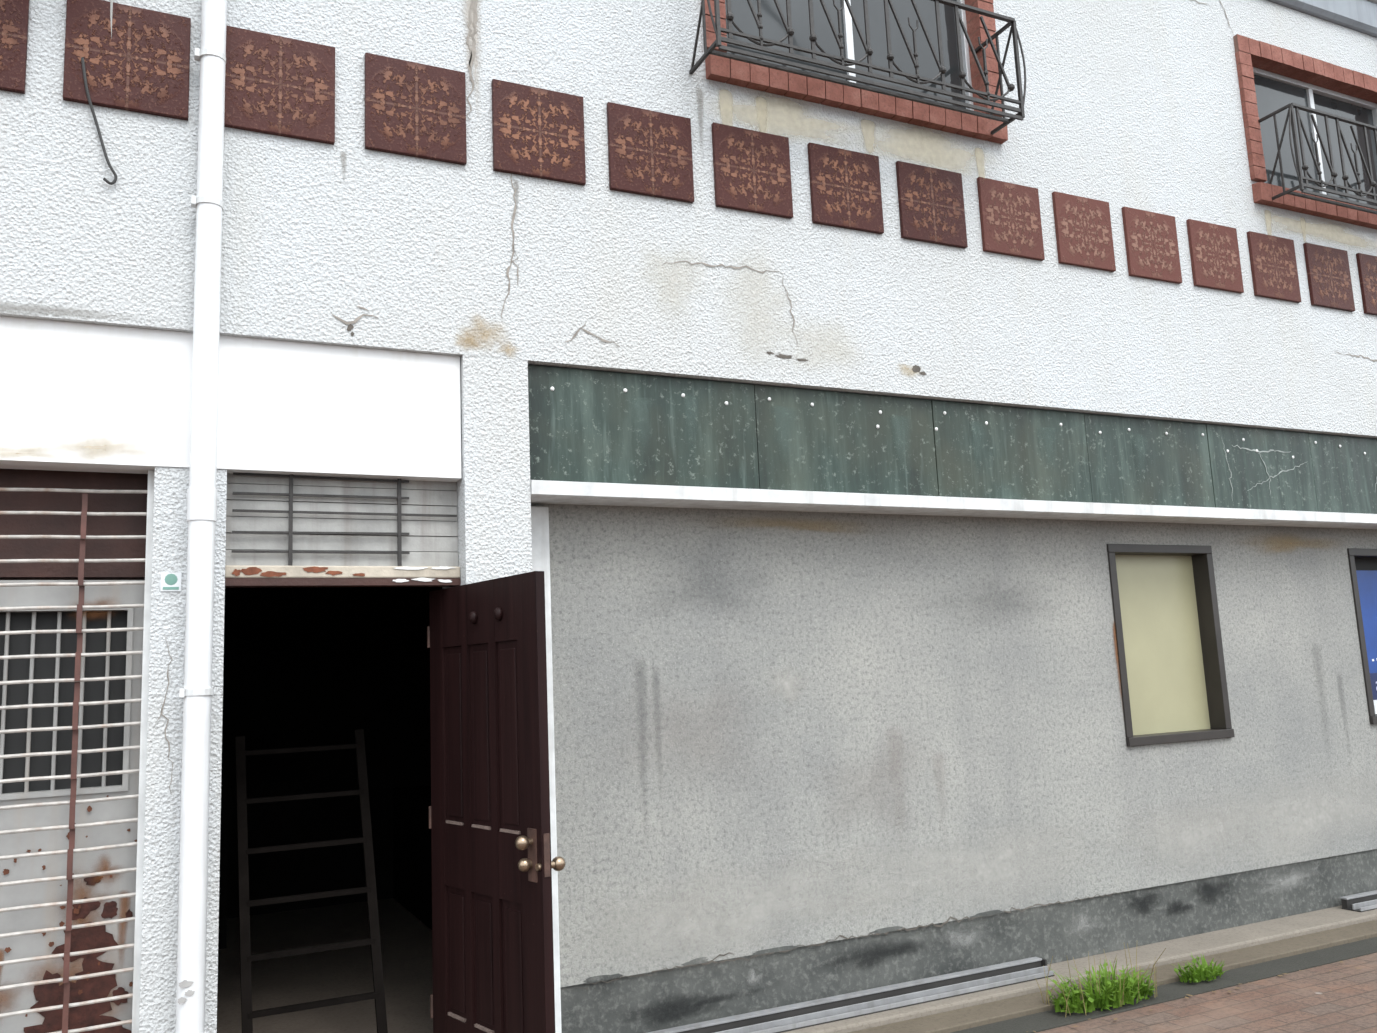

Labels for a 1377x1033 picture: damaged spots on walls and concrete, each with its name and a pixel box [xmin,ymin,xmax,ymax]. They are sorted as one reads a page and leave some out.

crack [466,0,478,120]
crack [501,173,519,320]
rust [232,567,286,577]
rust [303,566,365,576]
rust [24,861,133,1033]
water stain [855,944,911,964]
water stain [658,996,729,1021]